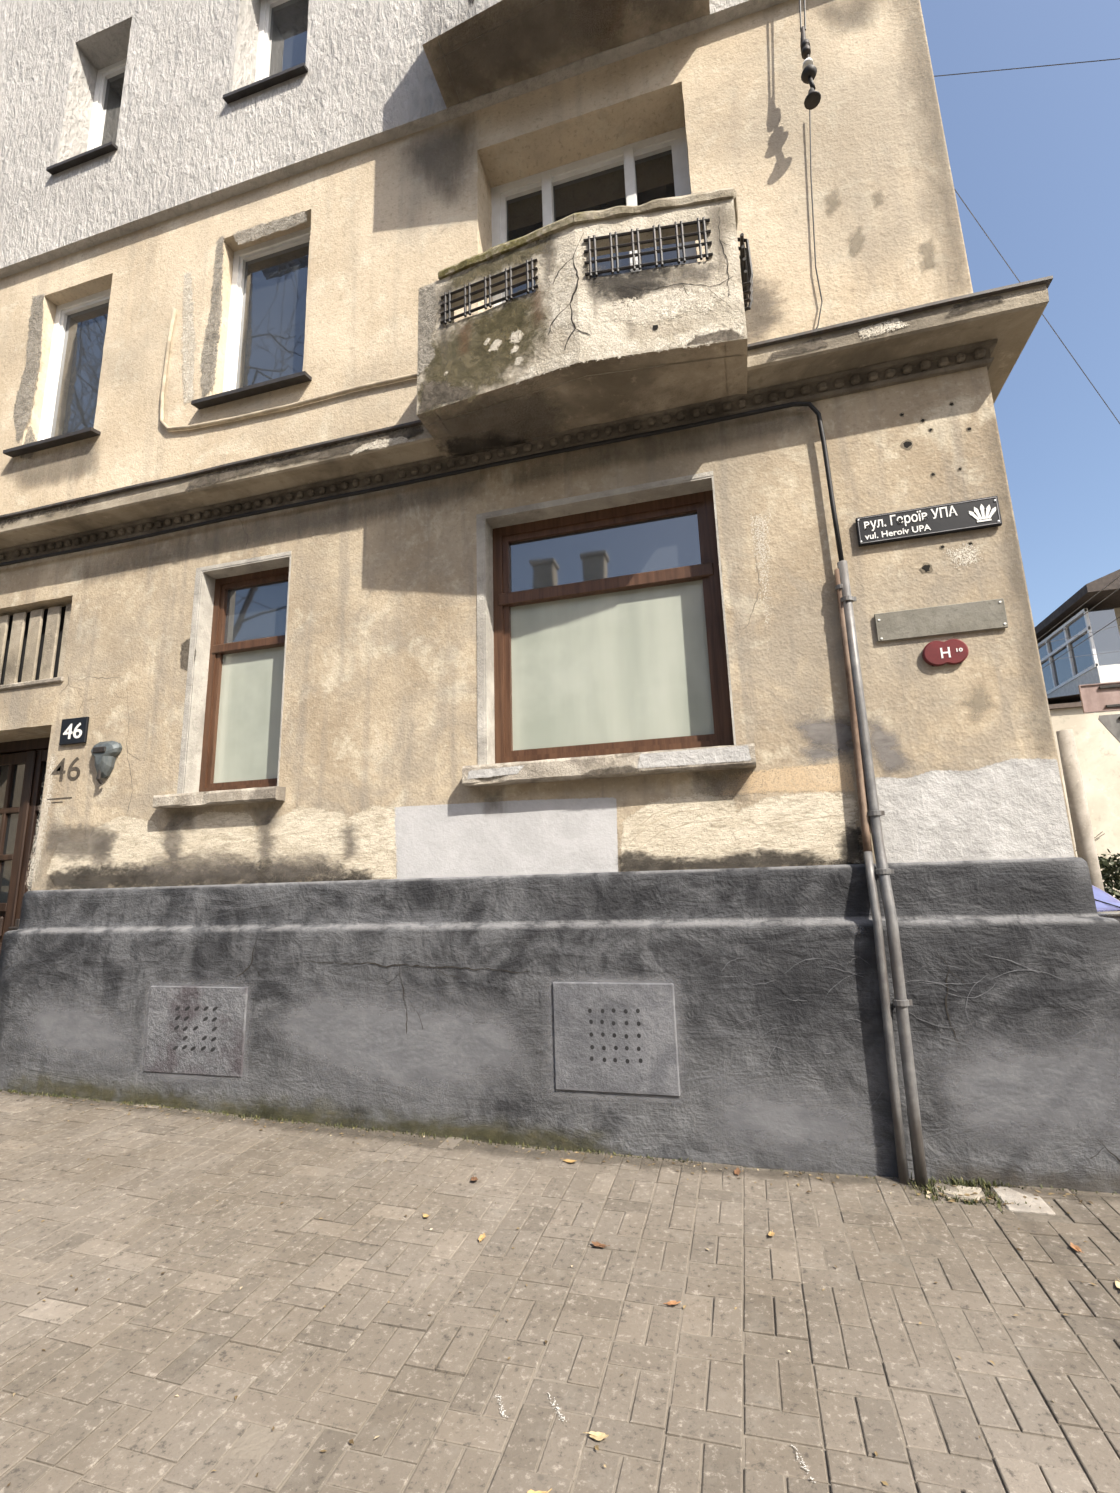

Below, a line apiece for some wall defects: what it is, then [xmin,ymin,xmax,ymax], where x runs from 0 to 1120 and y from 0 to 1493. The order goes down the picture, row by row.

flaking render [545,242,586,330]
crack [548,232,591,350]
spalling [484,283,746,385]
crack [621,211,733,298]
leakage [797,719,853,761]
leakage [870,724,905,771]